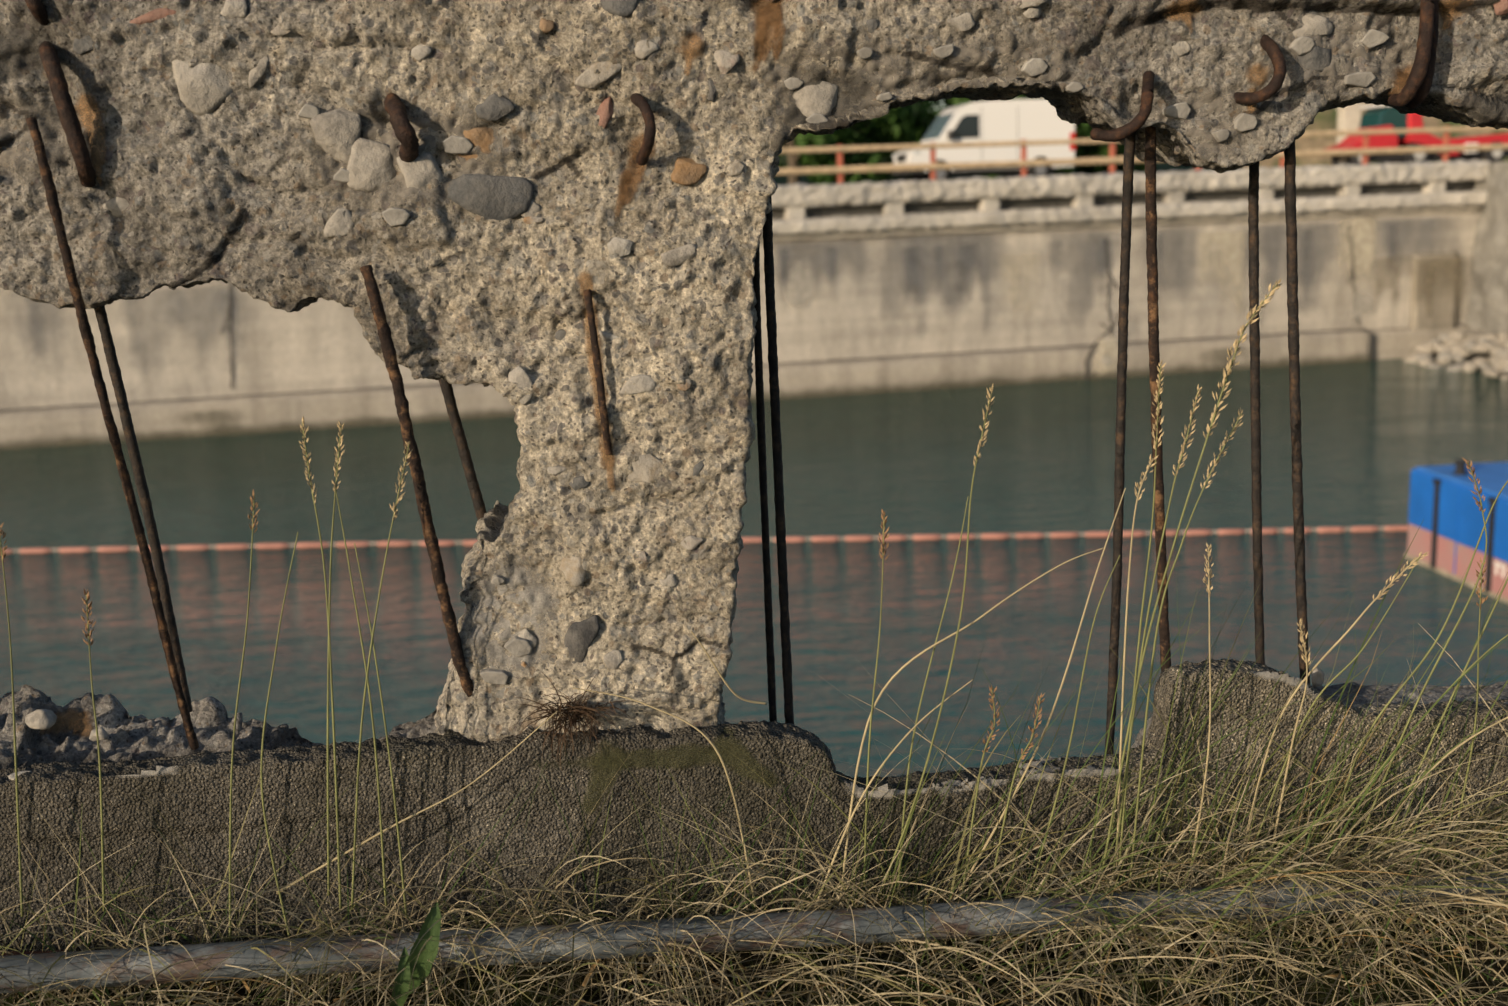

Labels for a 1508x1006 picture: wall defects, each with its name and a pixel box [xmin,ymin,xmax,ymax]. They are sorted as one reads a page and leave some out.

rust [77,95,106,183]
rust [615,135,653,216]
rust [752,0,785,71]
spalling [772,43,908,125]
spalling [0,0,199,750]
spalling [360,265,554,697]
rust [579,273,614,492]
spalling [753,196,794,724]
spalling [848,0,1439,798]
crack [630,639,727,684]